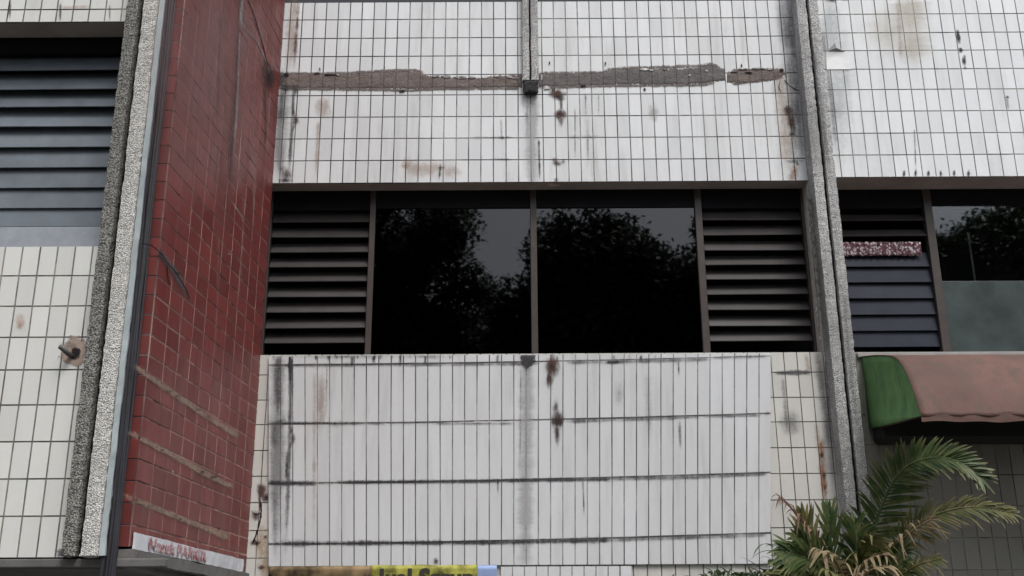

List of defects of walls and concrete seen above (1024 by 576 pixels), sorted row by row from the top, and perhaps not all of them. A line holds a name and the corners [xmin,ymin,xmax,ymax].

spalling [279,67,522,92]
spalling [539,61,786,90]
rust [551,88,566,124]
crack [141,243,190,299]
rust [547,357,558,384]
damp [607,356,726,371]
spalling [137,366,238,437]
damp [270,356,440,510]
rust [552,404,563,437]
spalling [131,433,233,488]
rust [819,442,827,494]
spalling [126,495,228,539]